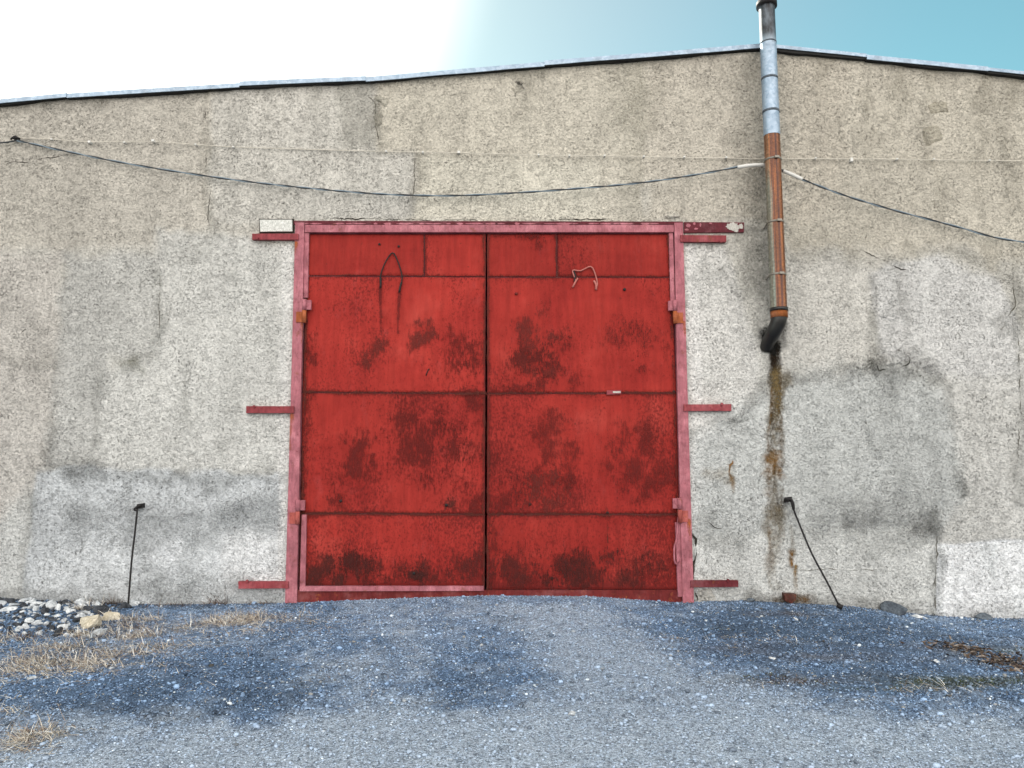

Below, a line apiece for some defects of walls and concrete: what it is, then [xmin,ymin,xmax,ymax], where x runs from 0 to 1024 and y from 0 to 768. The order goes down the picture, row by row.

rust [764,132,787,308]
rust [290,233,691,591]
rust [766,341,790,530]